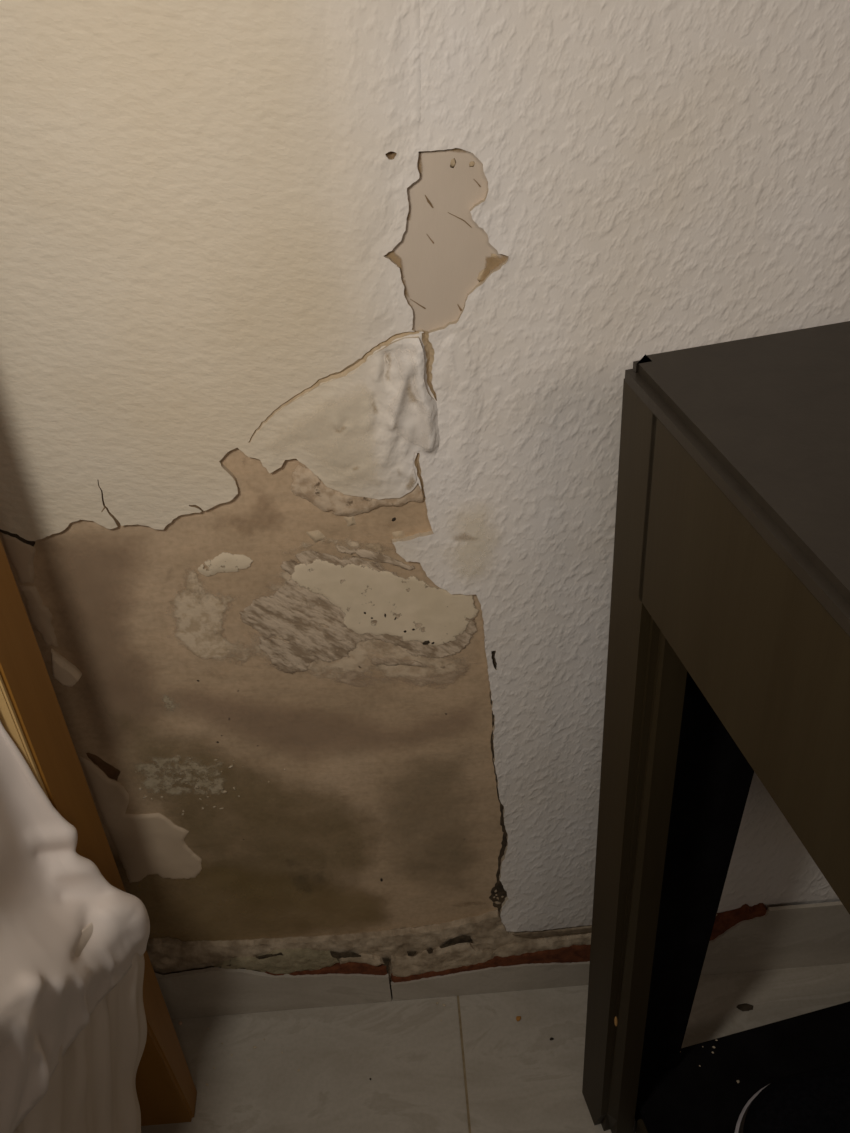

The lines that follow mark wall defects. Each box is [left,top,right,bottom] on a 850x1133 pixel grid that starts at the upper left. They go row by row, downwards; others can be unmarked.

flaking render [385,148,508,331]
crack [0,529,35,547]
crack [97,480,120,526]
damp [68,550,148,733]
flaking render [0,448,592,989]
damp [135,755,244,816]
damp [120,863,378,942]
spalling [710,903,768,941]